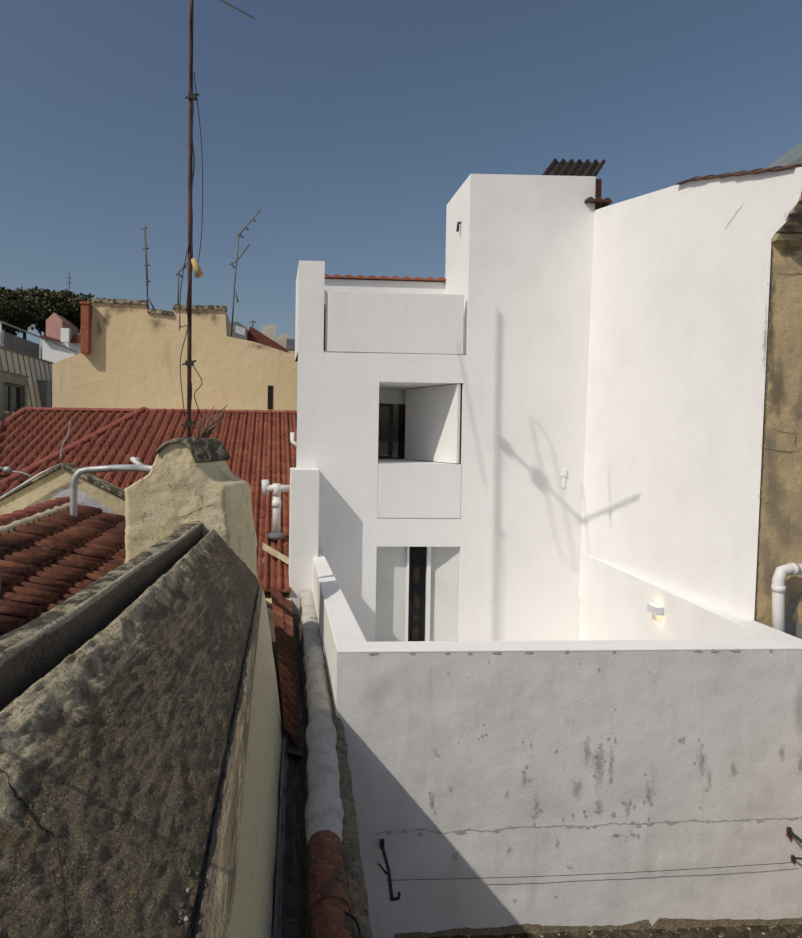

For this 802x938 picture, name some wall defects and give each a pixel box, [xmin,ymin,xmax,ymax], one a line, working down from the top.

leakage [784,212,802,231]
crack [372,817,802,836]
crack [0,769,70,938]